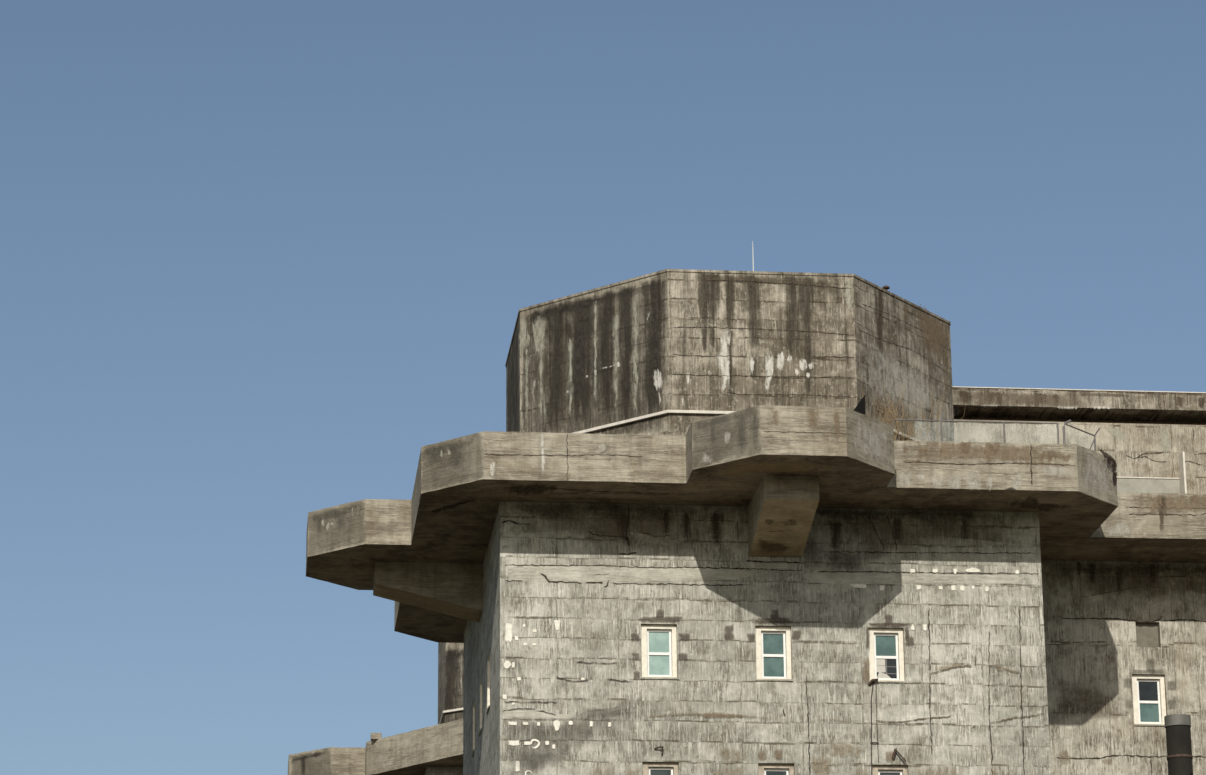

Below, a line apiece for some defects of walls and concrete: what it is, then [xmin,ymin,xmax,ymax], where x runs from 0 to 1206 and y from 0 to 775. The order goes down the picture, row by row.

water stain [699,272,853,395]
water stain [508,281,665,470]
water stain [509,484,573,527]
crack [505,508,1038,587]
water stain [445,650,464,722]